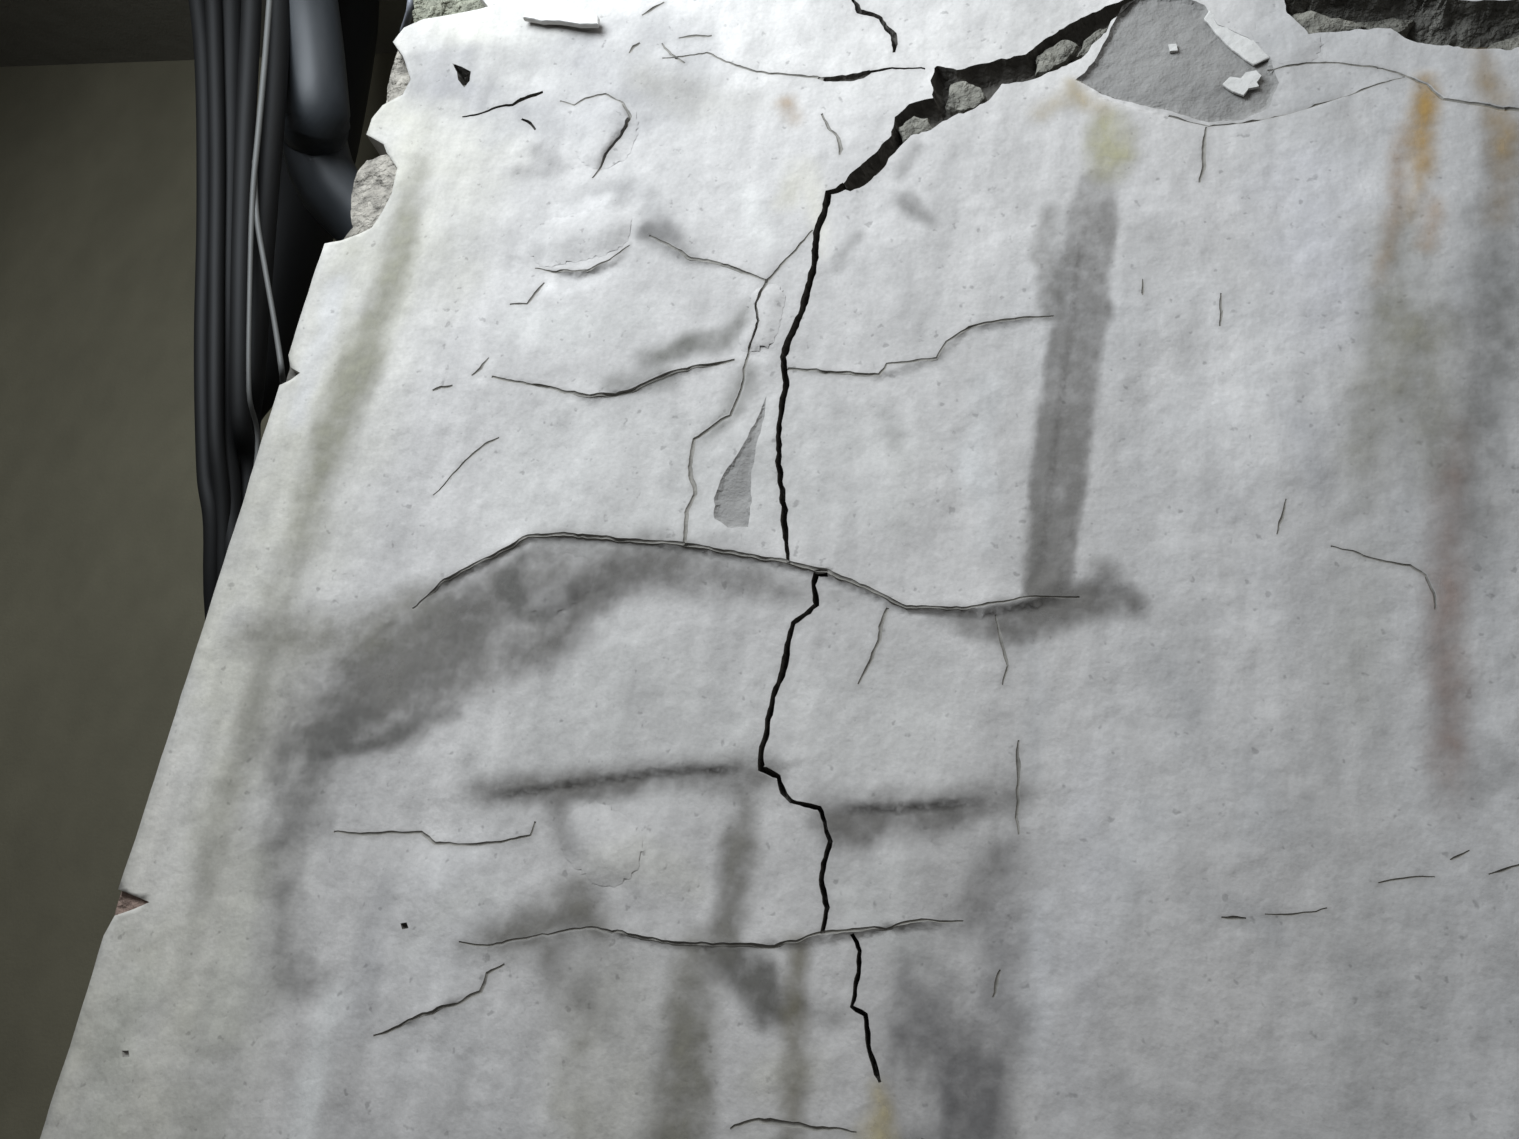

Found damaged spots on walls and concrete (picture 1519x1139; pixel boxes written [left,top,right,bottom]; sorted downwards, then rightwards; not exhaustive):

spalling [412,0,485,23]
spalling [1076,0,1279,122]
spalling [1284,0,1519,50]
corrosion [1413,89,1434,170]
spalling [344,155,397,239]
damp [969,207,1138,639]
crack [373,0,1135,1083]
crack [334,821,536,846]
damp [484,770,650,805]
damp [822,801,982,842]
damp [715,832,802,1021]
crack [730,1118,857,1133]